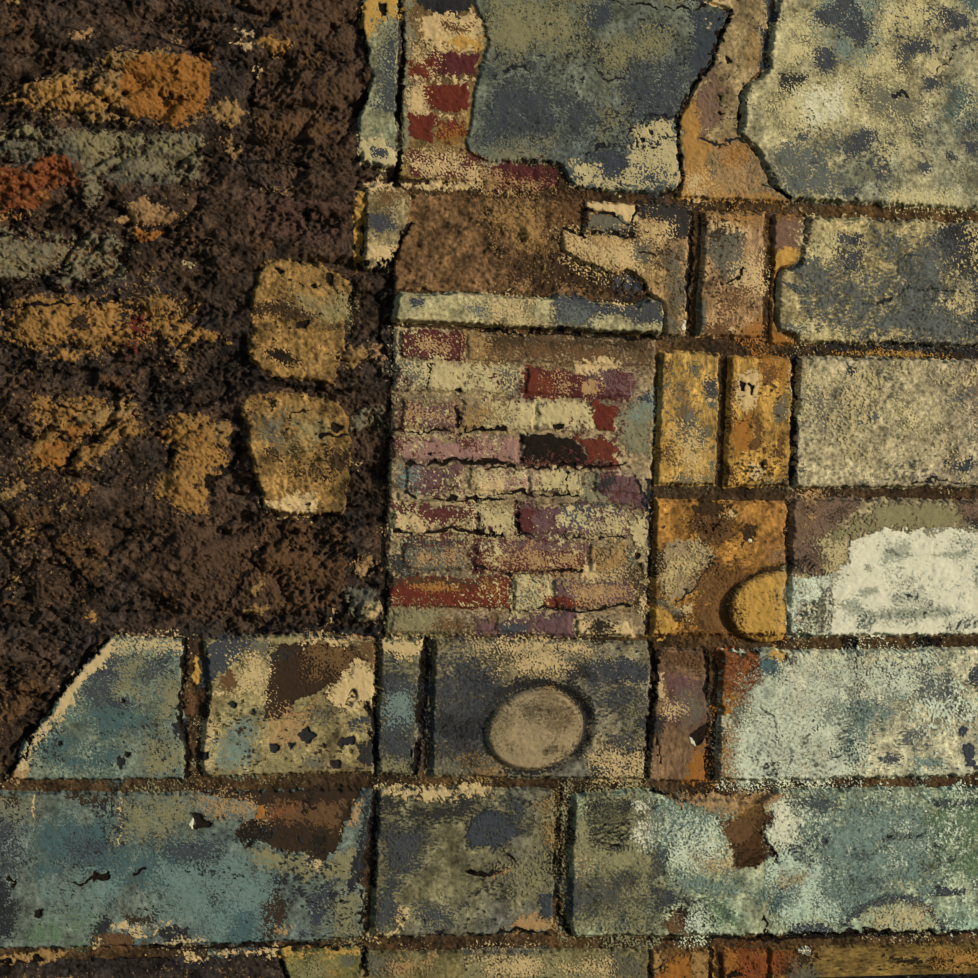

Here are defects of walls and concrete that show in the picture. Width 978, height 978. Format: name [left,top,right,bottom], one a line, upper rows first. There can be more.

spalling [526,1,623,105]